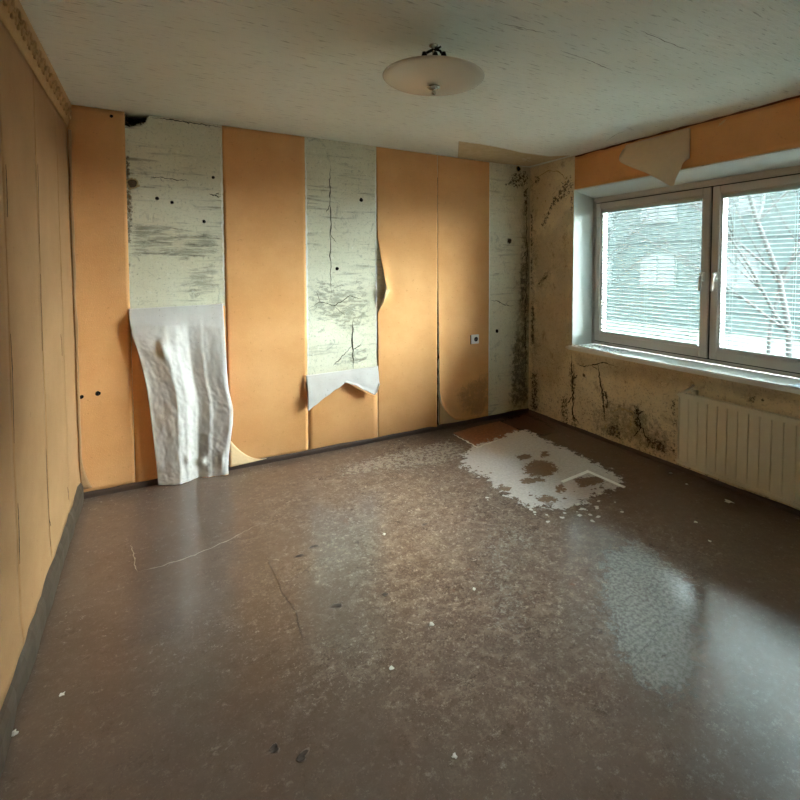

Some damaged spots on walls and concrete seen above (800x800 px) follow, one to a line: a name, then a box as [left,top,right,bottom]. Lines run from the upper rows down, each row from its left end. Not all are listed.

spalling [125,114,149,128]
spalling [126,178,140,190]
peeling [619,128,690,186]
crack [310,165,361,364]
water stain [508,171,573,289]
peeling [129,303,267,485]
peeling [304,366,380,411]
crack [568,355,614,425]
crack [634,405,652,443]
peeling [458,429,624,523]